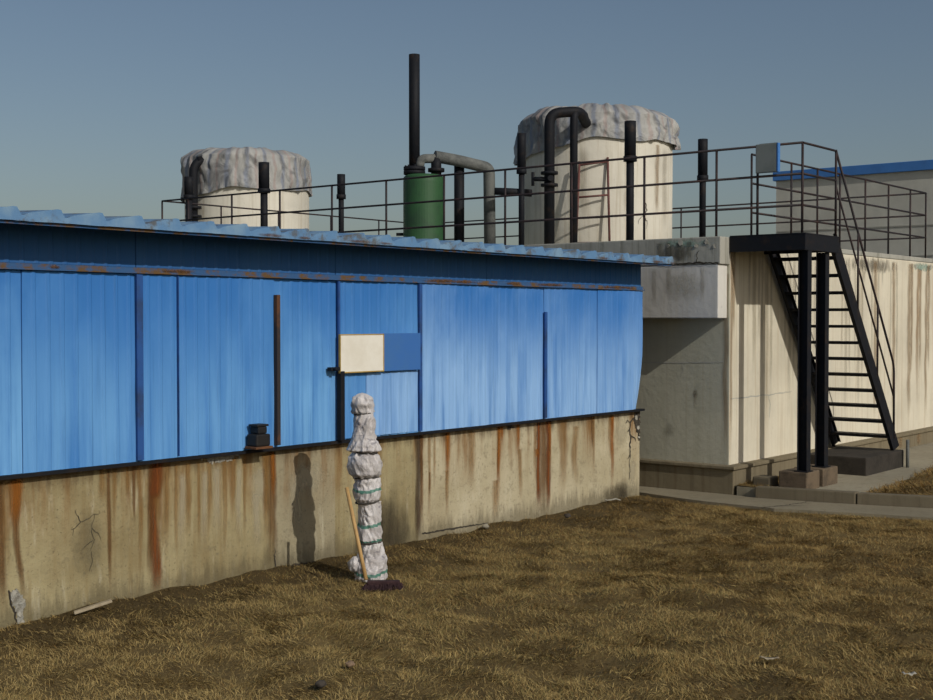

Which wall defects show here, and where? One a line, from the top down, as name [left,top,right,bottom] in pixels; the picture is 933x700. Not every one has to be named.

corrosion [536,421,551,498]
crack [625,417,636,479]
corrosion [0,480,22,584]
crack [72,511,101,571]
corrosion [149,463,162,579]